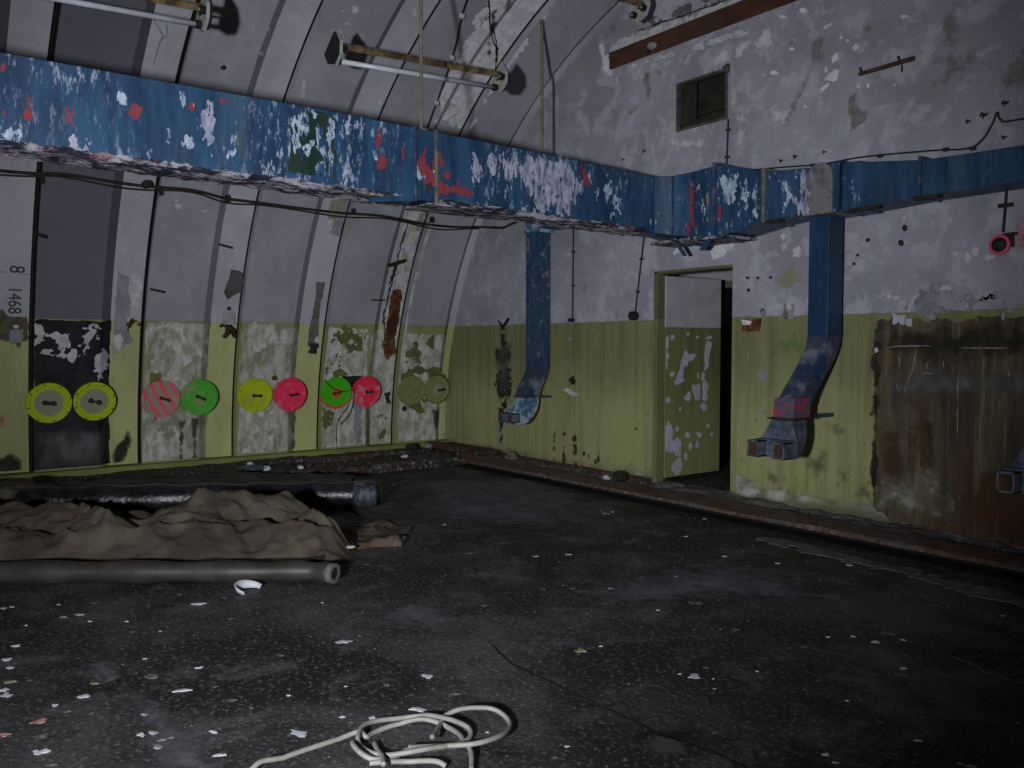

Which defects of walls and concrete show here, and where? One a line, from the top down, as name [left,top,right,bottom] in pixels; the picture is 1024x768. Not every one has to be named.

peeling [2,95,33,142]
peeling [61,116,91,151]
peeling [117,91,143,120]
peeling [166,91,239,159]
peeling [287,79,356,180]
peeling [373,130,388,170]
peeling [417,147,621,220]
peeling [778,169,813,216]
corrosion [381,289,402,359]
peeling [0,272,211,462]
peeling [398,333,446,441]
crack [488,641,748,768]